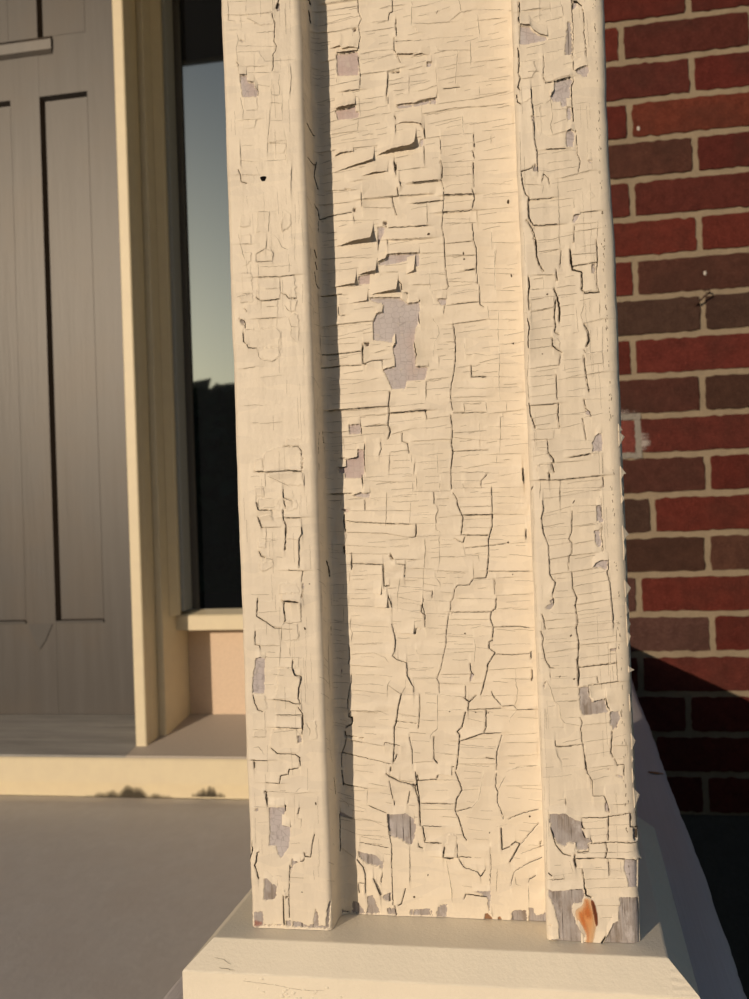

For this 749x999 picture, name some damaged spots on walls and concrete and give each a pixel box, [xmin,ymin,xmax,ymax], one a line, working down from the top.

peeling [329,29,359,76]
peeling [396,88,436,109]
peeling [550,0,589,147]
peeling [334,127,423,172]
peeling [330,221,428,389]
crack [227,0,640,944]
peeling [253,647,302,753]
peeling [579,676,633,729]
peeling [256,791,300,868]
peeling [386,805,416,844]
peeling [548,803,591,854]
rust [576,899,598,943]